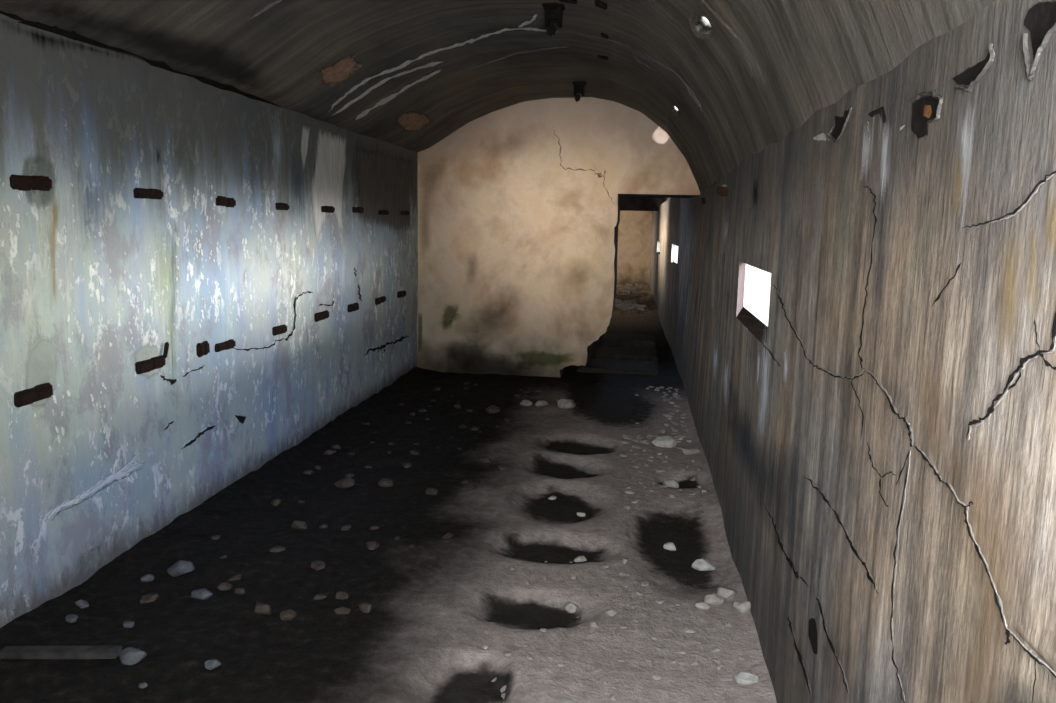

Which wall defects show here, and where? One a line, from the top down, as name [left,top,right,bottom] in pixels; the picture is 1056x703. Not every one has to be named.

leakage [49,7,256,86]
leakage [321,56,360,86]
spalling [953,44,995,91]
spalling [1023,1,1056,81]
spalling [813,108,853,143]
spalling [868,107,886,123]
spalling [900,89,943,138]
crack [963,171,1056,228]
crack [232,291,334,351]
crack [160,365,205,385]
crack [164,421,216,449]
crack [765,186,1056,703]